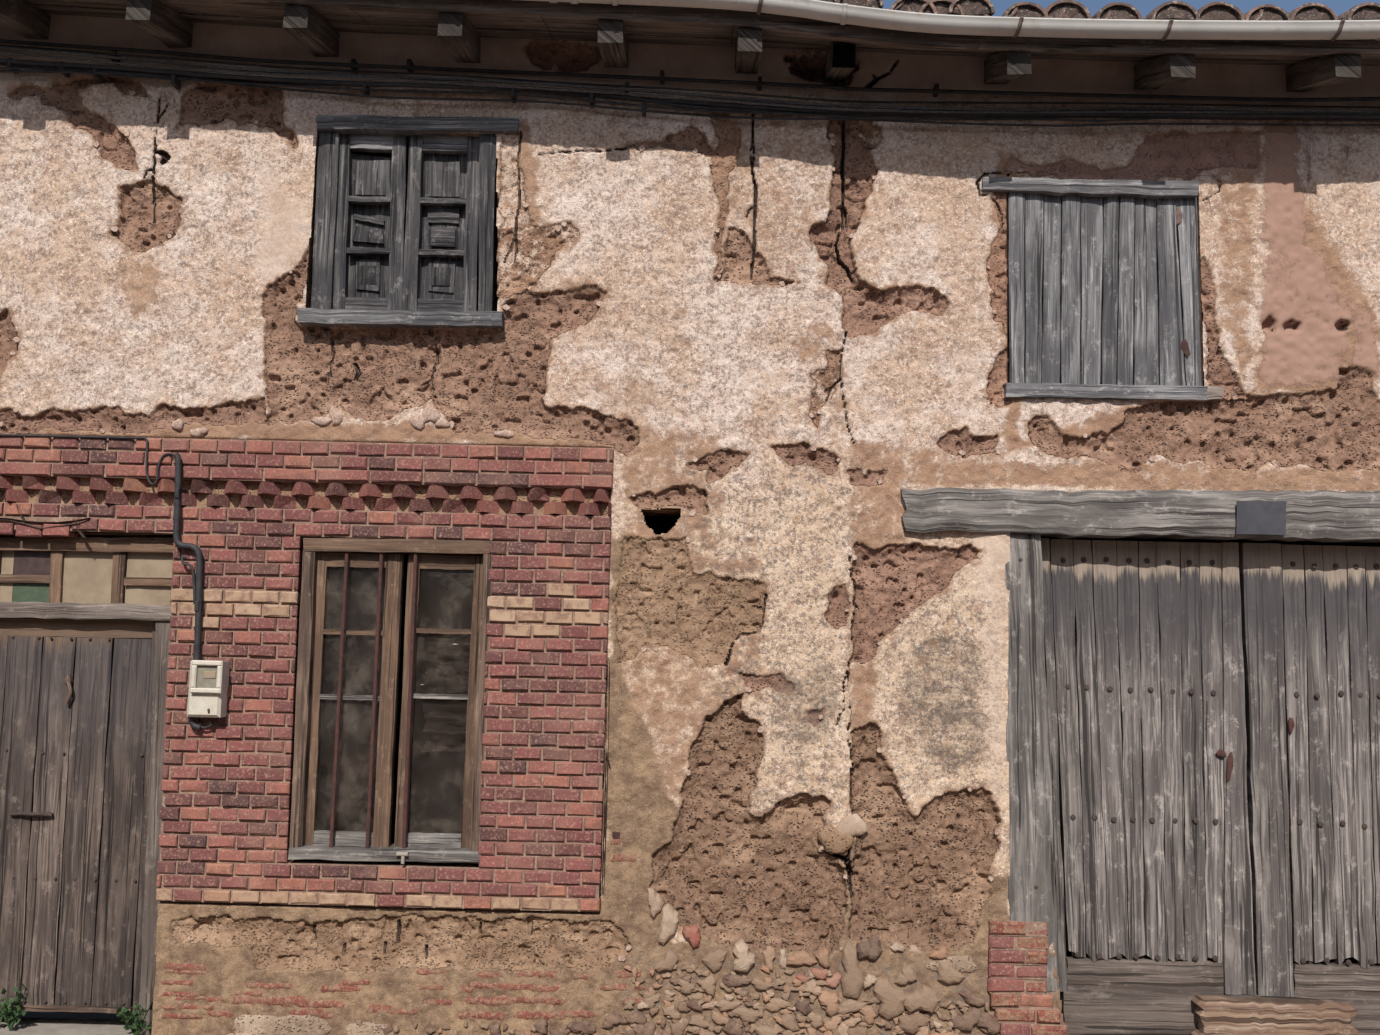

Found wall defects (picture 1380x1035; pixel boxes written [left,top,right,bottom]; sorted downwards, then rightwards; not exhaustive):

spalling [9,75,182,252]
crack [142,92,171,223]
spalling [0,133,639,456]
crack [746,114,758,279]
crack [835,120,853,283]
spalling [809,117,949,337]
spalling [1003,121,1380,474]
crack [826,331,857,448]
crack [836,555,855,812]
spalling [825,543,983,663]
spalling [610,673,1001,956]
crack [822,846,853,898]